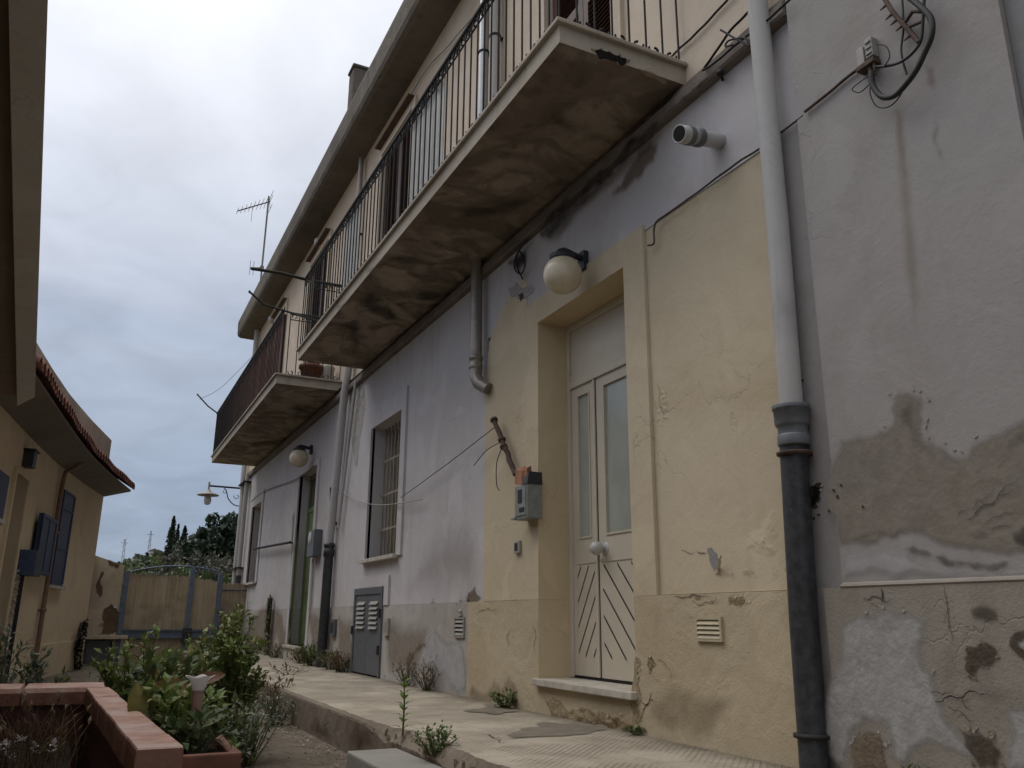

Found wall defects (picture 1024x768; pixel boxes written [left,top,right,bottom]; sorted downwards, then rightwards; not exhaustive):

spalling [591,47,631,71]
water stain [540,124,657,237]
water stain [318,258,438,355]
peeling [810,387,1024,552]
crack [958,475,1024,531]
peeling [707,548,722,574]
flaking render [98,604,124,635]
flaking render [456,587,480,606]
crack [864,589,891,607]
flaking render [546,654,655,733]
peeling [826,605,1024,768]
crack [930,690,990,722]